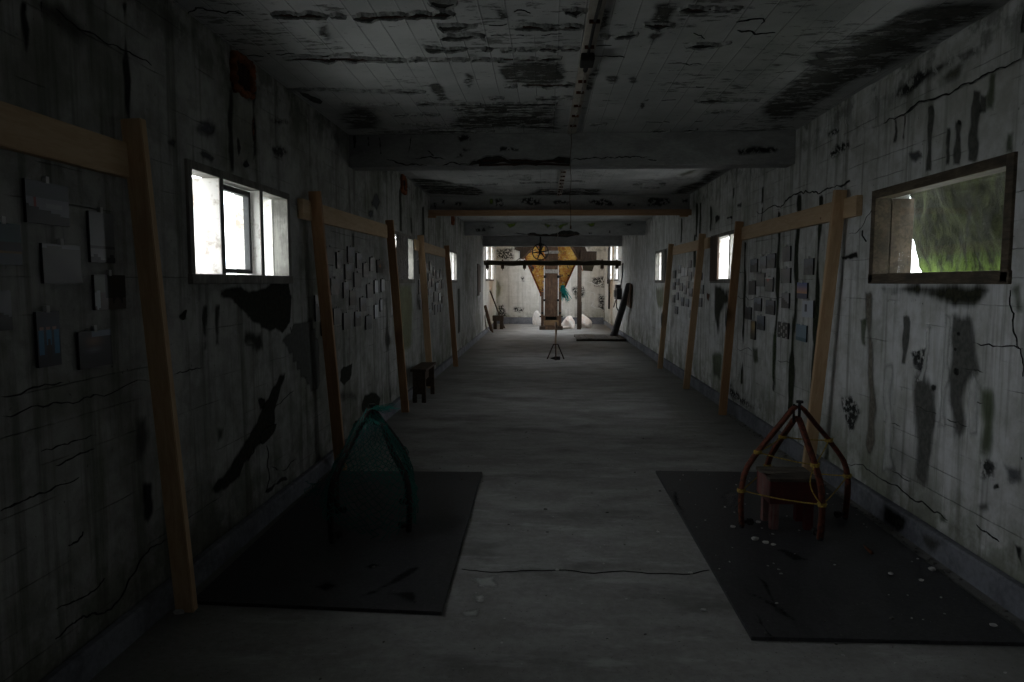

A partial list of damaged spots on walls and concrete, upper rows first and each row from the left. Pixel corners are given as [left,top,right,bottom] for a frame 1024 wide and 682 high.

water stain [897,50,972,96]
crack [884,58,1021,124]
crack [757,180,849,214]
crack [0,380,150,417]
water stain [203,284,291,350]
water stain [842,293,936,486]
water stain [904,284,987,435]
crack [963,290,1024,377]
water stain [213,374,285,493]
crack [1,435,93,511]
crack [462,568,708,576]